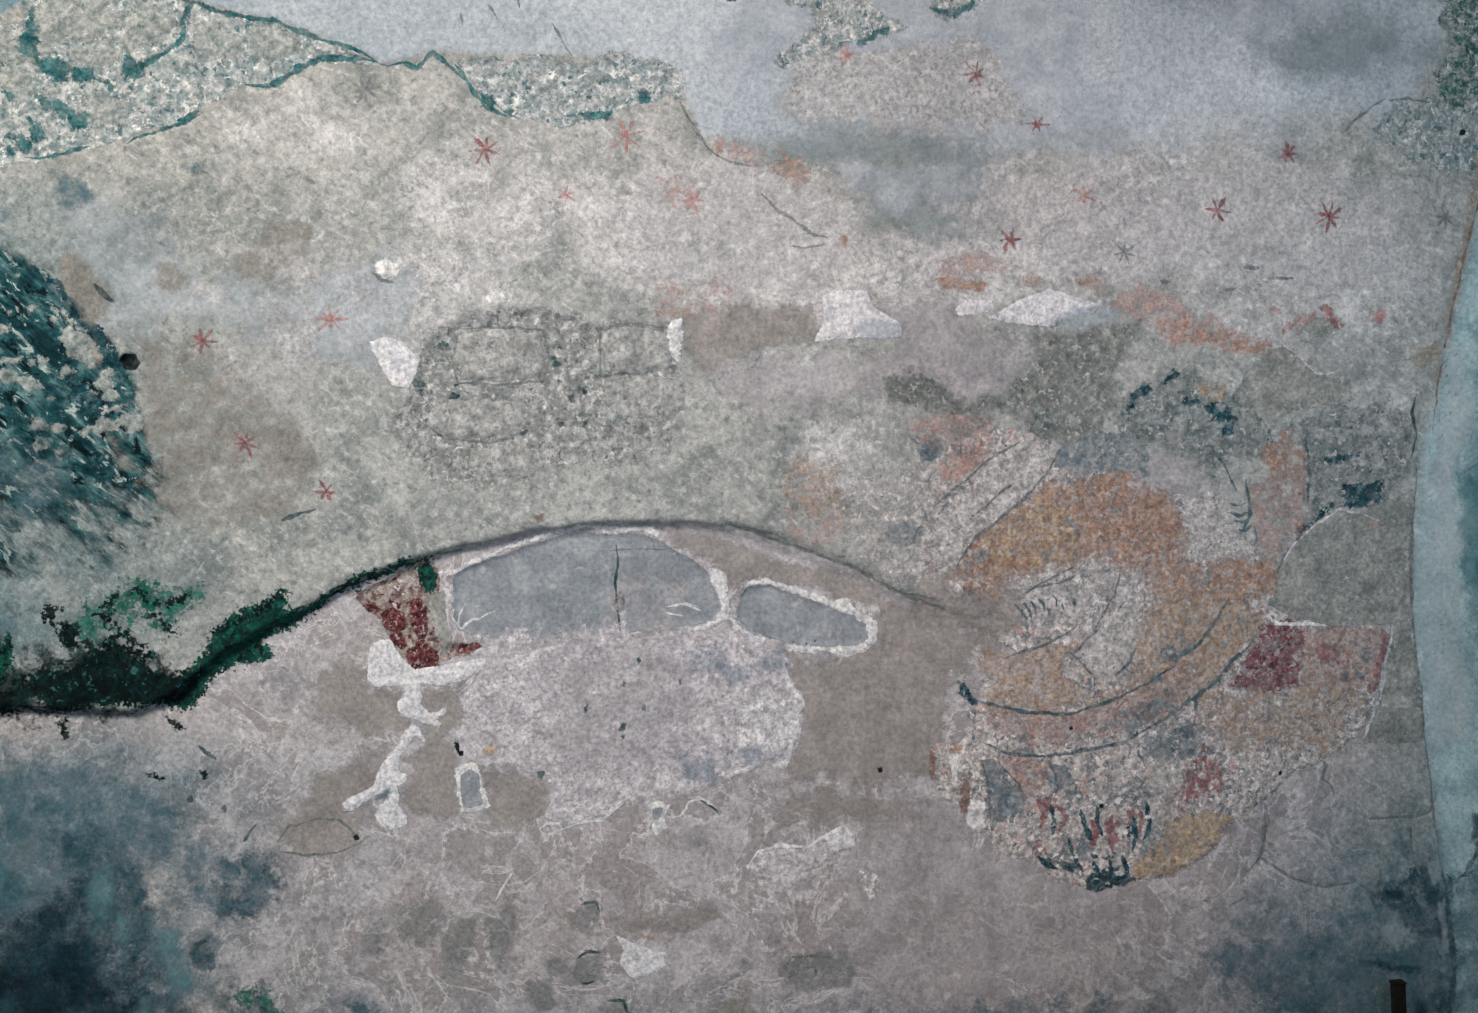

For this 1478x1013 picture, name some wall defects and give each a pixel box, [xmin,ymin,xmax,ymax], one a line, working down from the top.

flaking render [775,0,907,69]
flaking render [930,0,983,22]
flaking render [0,0,374,169]
flaking render [457,50,687,128]
flaking render [1373,0,1478,177]
peeling [815,289,902,342]
peeling [955,288,1114,360]
crack [614,545,663,629]
crack [724,520,947,612]